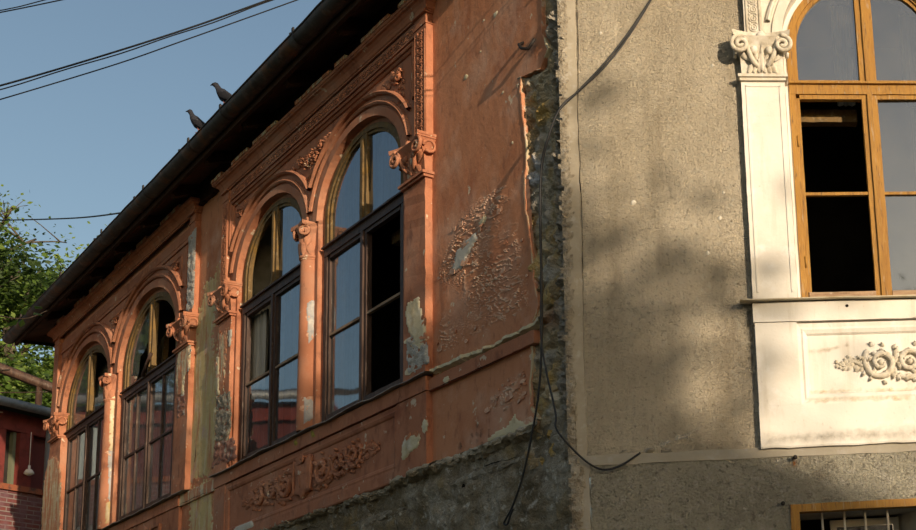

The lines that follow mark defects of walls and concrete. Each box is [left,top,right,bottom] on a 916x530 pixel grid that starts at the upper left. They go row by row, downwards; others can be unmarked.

spalling [211,120,278,184]
flaking render [234,0,586,530]
peeling [175,227,237,489]
peeling [41,455,62,530]
peeling [105,396,115,523]
peeling [187,493,214,530]